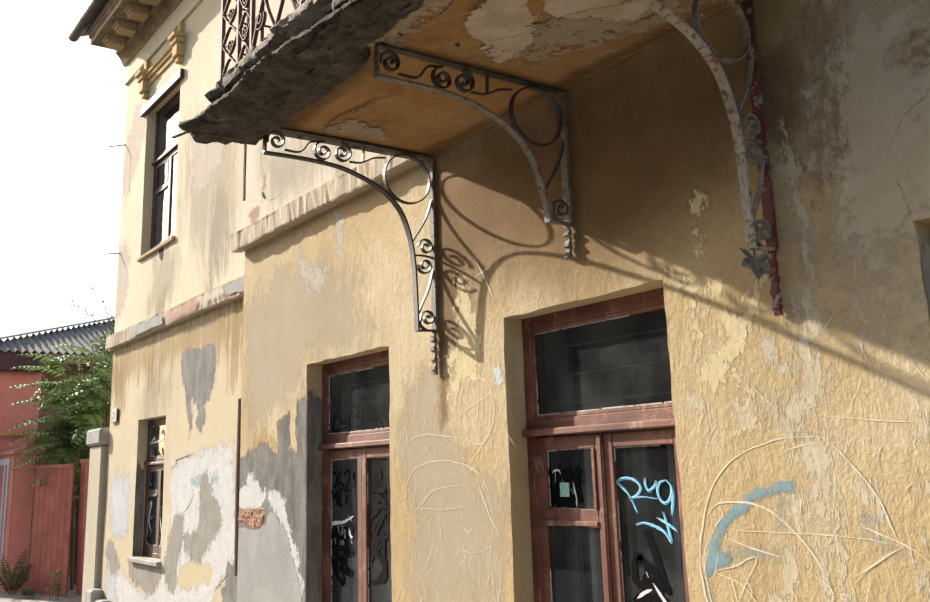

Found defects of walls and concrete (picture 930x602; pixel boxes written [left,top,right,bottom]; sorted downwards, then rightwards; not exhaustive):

peeling [367,0,457,51]
peeling [463,0,724,69]
peeling [442,271,504,414]
peeling [660,117,894,602]
peeling [104,438,305,602]
peeling [909,534,930,602]